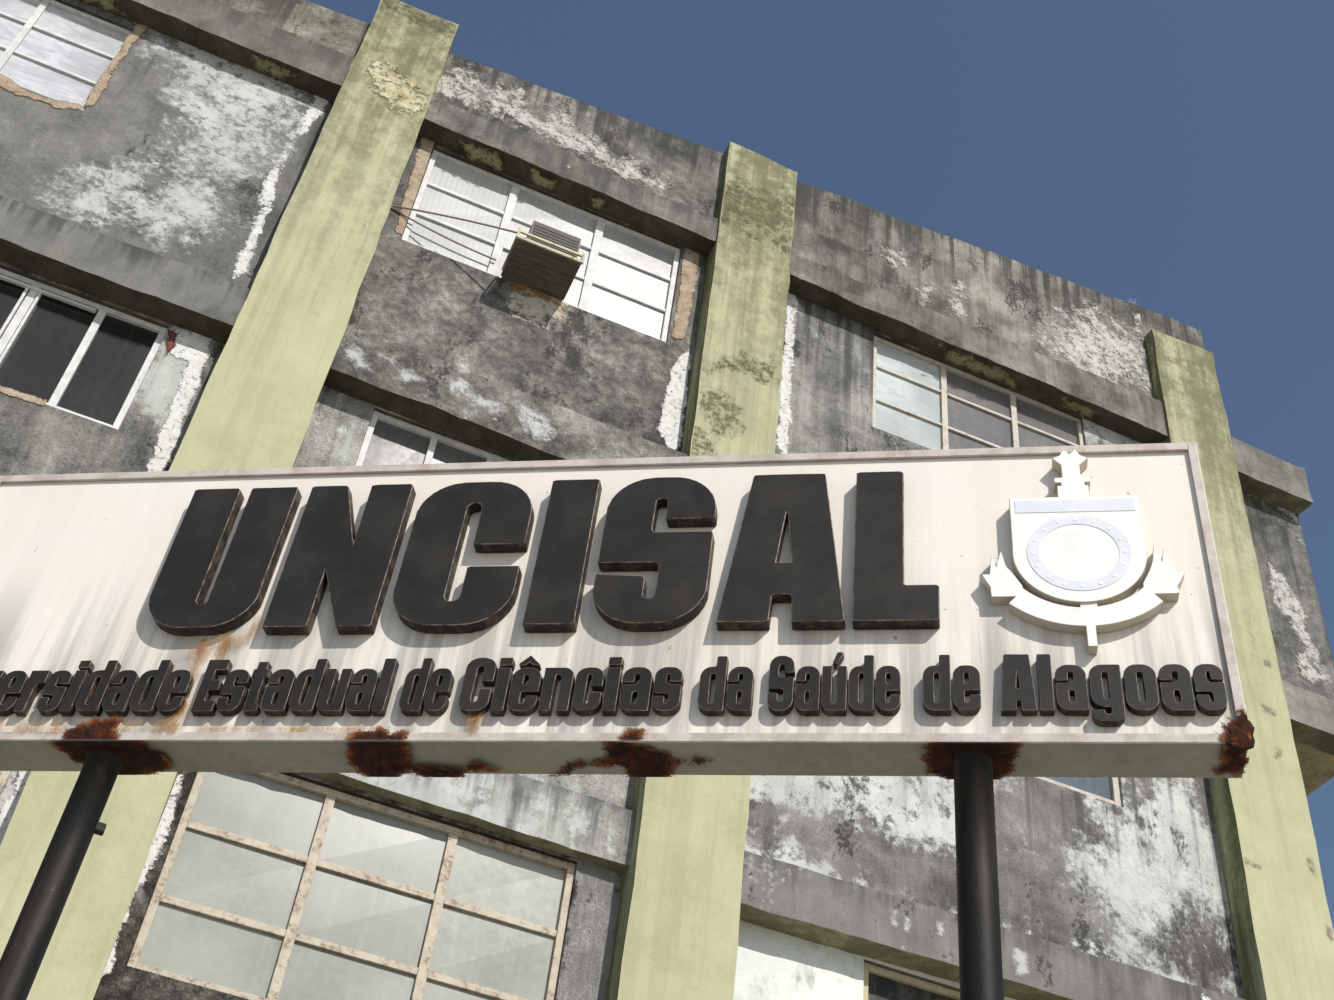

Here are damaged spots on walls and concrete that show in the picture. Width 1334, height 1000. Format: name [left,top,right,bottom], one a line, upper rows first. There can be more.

spalling [0,24,148,110]
damp [52,39,304,242]
peeling [363,59,670,191]
spalling [0,386,47,406]
damp [1136,811,1189,873]
damp [1135,881,1242,989]